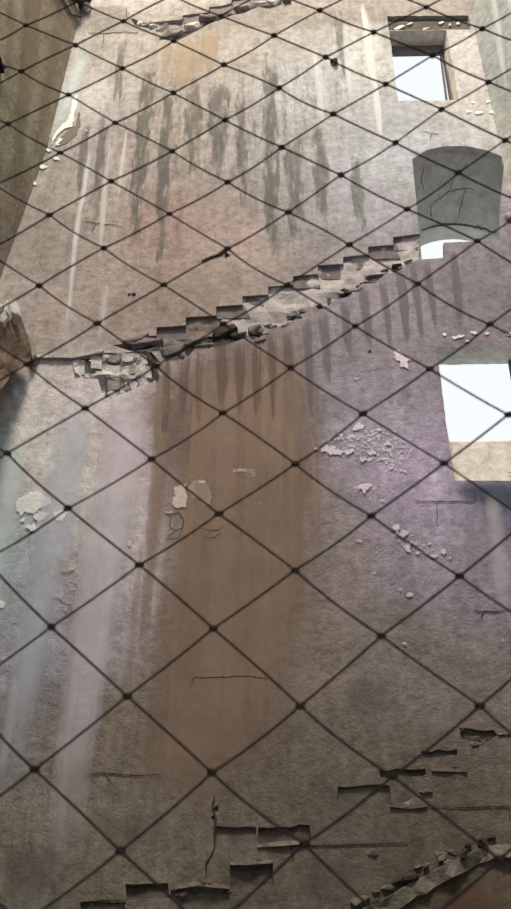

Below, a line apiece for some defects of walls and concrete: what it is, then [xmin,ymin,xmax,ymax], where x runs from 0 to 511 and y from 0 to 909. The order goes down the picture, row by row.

leakage [362,8,382,135]
leakage [67,168,88,312]
leakage [120,73,173,230]
leakage [264,68,279,240]
crack [421,163,496,234]
peeling [394,350,410,369]
leakage [0,437,17,559]
peeling [15,490,67,531]
peeling [314,423,413,501]
leakage [67,422,139,743]
crack [205,795,220,874]
spalling [350,834,511,909]